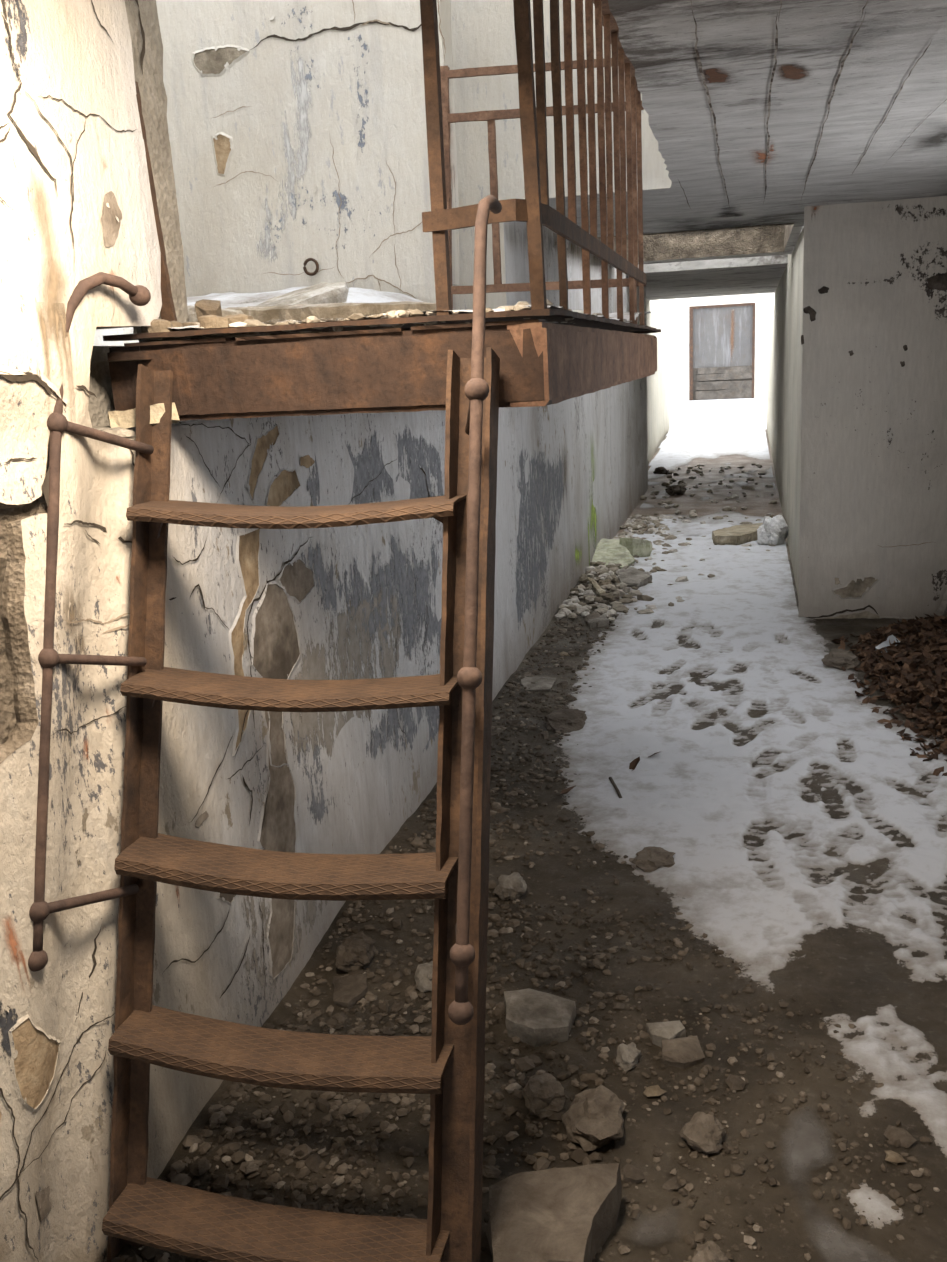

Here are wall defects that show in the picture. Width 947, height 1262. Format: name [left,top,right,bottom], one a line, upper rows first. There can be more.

crack [0,0,145,276]
crack [249,0,446,62]
rust [703,68,729,83]
rust [780,65,808,80]
crack [801,0,869,199]
crack [0,366,97,408]
spalling [212,424,320,506]
peeling [345,425,444,504]
spalling [0,434,50,764]
peeling [197,528,442,680]
spalling [0,1000,60,1113]
crack [0,925,115,1262]